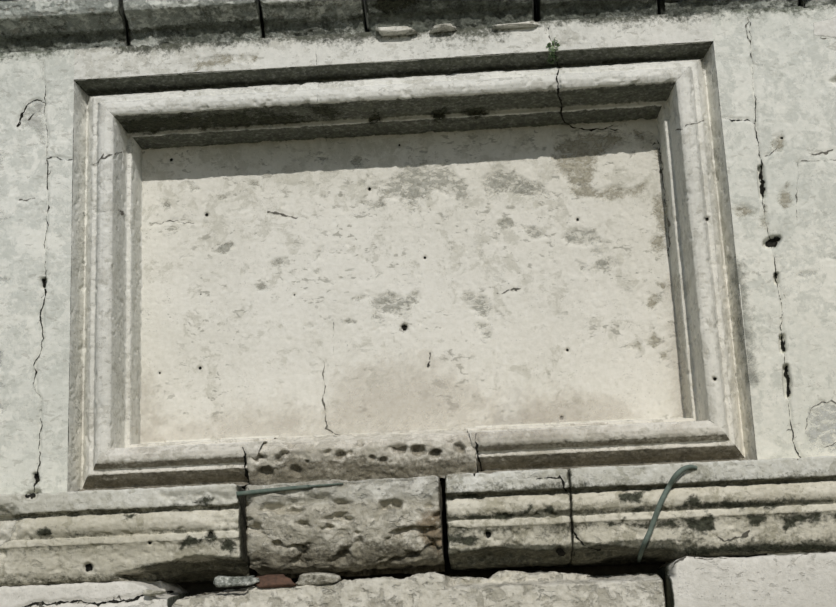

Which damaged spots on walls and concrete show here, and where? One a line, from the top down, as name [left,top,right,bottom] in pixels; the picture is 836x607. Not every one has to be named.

crack [548,28,621,131]
crack [653,139,671,256]
crack [17,78,72,499]
crack [676,95,836,460]
crack [322,365,338,435]
crack [24,594,144,607]